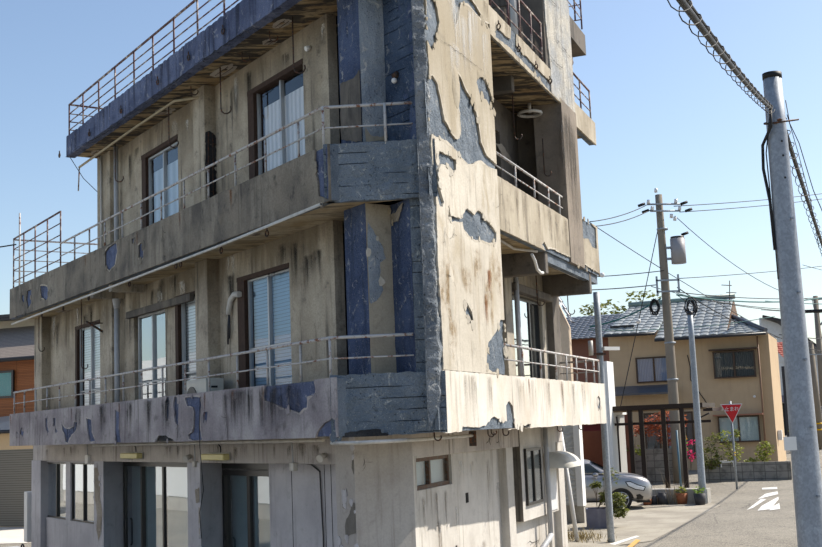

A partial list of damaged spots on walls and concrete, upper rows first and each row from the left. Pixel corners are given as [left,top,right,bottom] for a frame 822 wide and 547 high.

peeling [424,0,439,49]
spalling [453,0,550,91]
peeling [425,71,496,246]
peeling [366,223,386,304]
peeling [486,320,508,378]
peeling [46,417,95,442]
peeling [163,394,207,440]
peeling [265,381,317,415]
spalling [462,402,529,432]
peeling [336,489,359,547]